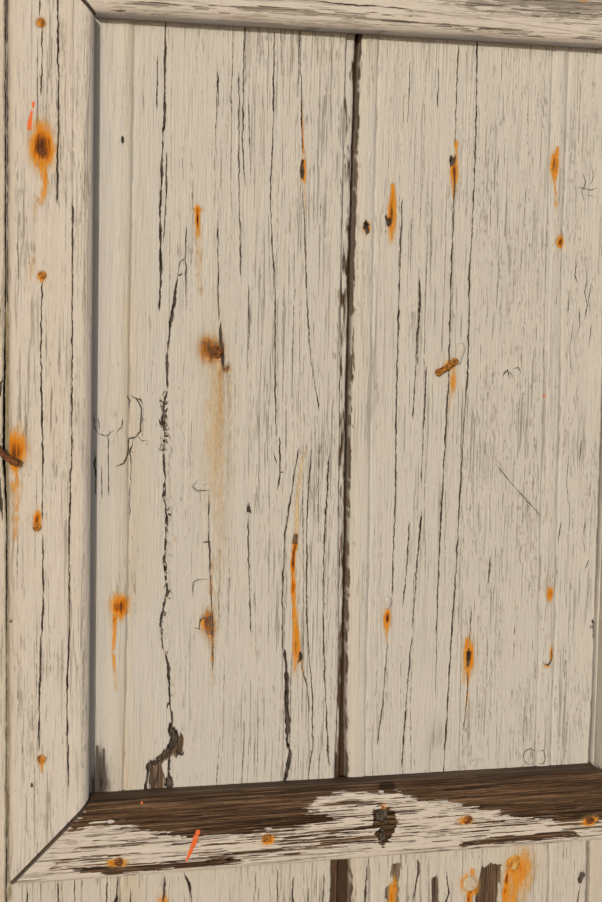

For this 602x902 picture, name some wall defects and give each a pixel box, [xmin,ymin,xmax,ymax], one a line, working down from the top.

peeling [113,1,180,12]
peeling [192,0,602,40]
corrosion [29,121,56,201]
corrosion [387,184,397,238]
corrosion [550,147,559,205]
crack [39,0,214,789]
corrosion [9,431,26,530]
crack [37,282,45,751]
corrosion [290,453,305,670]
corrosion [111,595,128,670]
peeling [50,727,602,875]
corrosion [502,854,531,902]